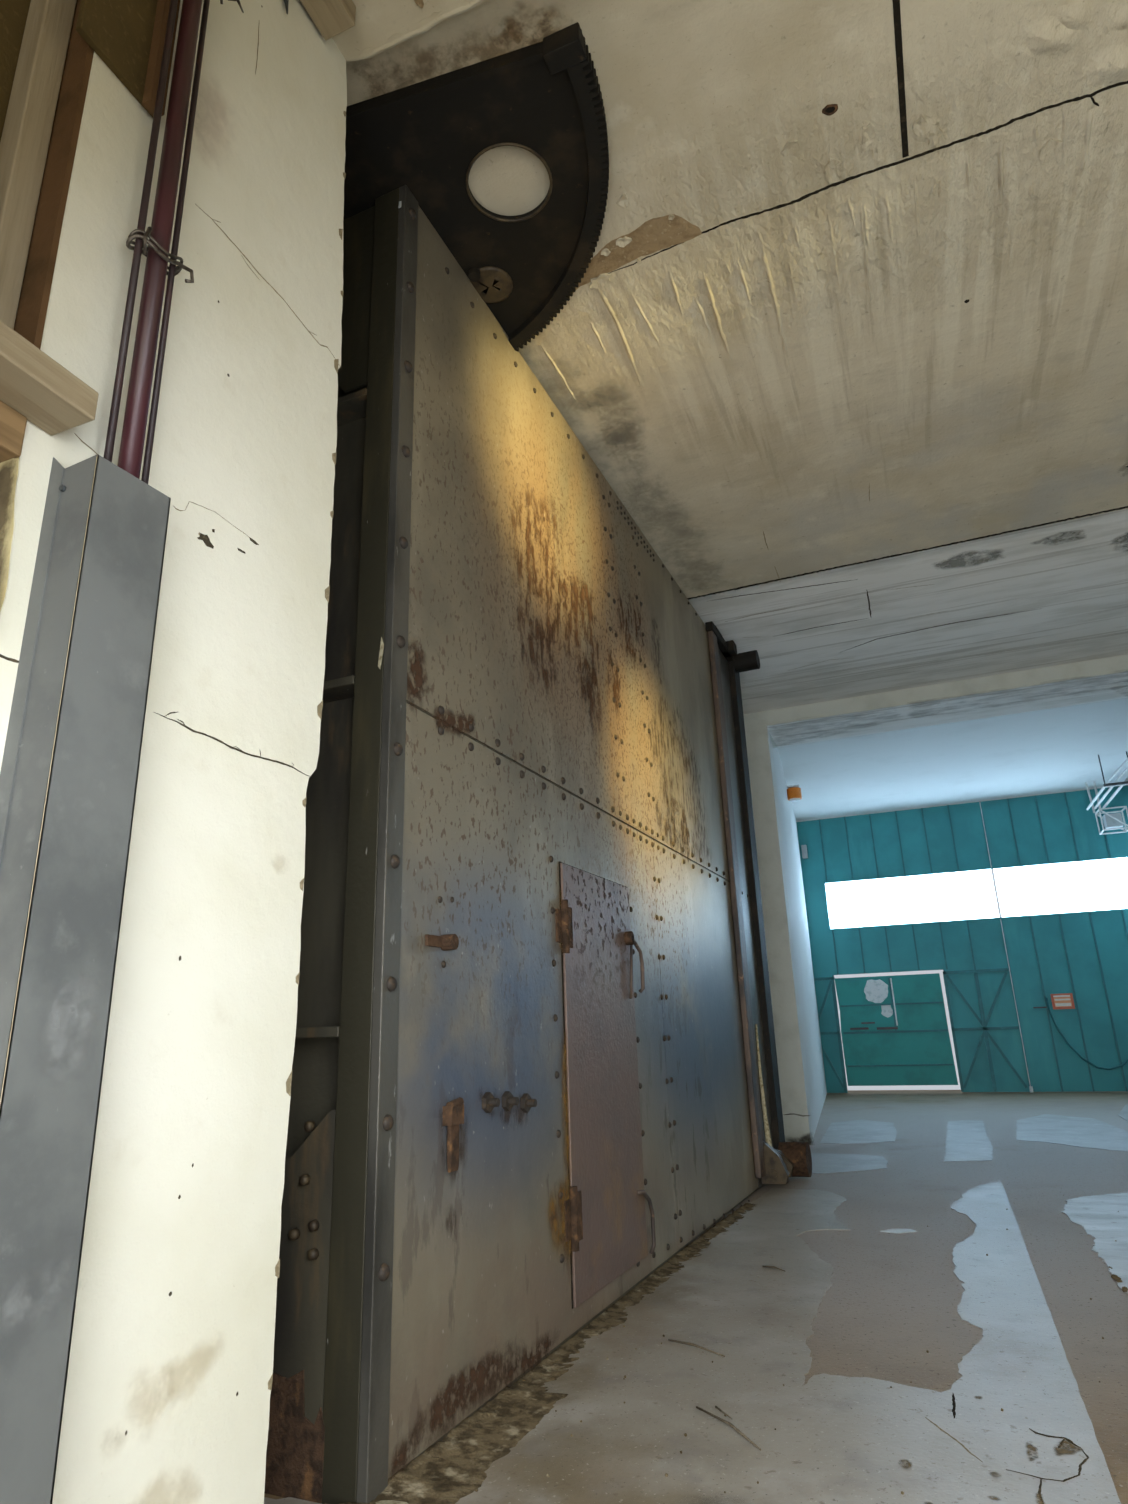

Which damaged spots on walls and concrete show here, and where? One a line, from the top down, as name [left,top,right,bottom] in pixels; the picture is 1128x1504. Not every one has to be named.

crack [608,81,1128,274]
peeling [573,214,702,387]
peeling [541,345,580,407]
corrosion [407,644,427,704]
corrosion [512,493,661,730]
damp [936,551,1000,568]
damp [1035,531,1084,544]
crack [154,712,311,777]
corrosion [650,702,709,857]
peeling [455,1120,1128,1504]
corrosion [392,1336,551,1475]
crack [925,1393,1089,1504]